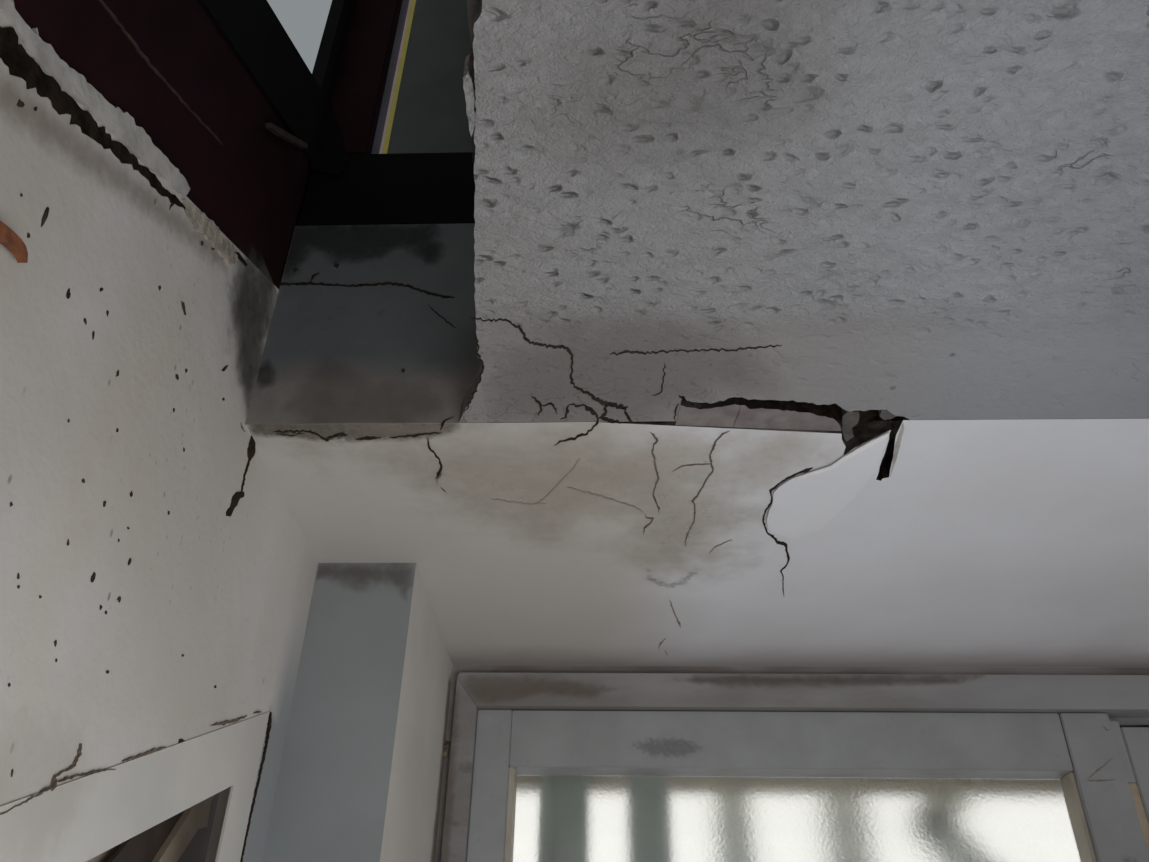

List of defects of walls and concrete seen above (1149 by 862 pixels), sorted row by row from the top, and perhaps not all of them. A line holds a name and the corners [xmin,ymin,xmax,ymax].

flaking render [0,0,238,266]
crack [273,273,782,553]
crack [762,467,813,595]
peeling [767,403,904,539]
crack [659,600,681,656]
crack [0,743,165,815]
crack [210,711,272,862]